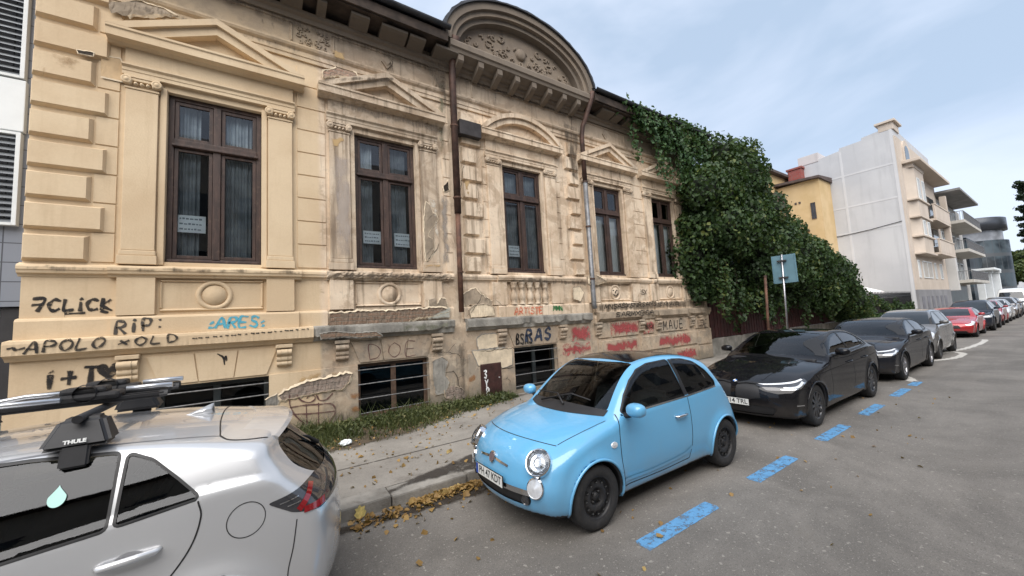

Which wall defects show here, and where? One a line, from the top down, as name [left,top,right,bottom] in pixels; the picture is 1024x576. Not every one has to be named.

spalling [109,0,179,19]
peeling [423,201,438,262]
spalling [463,287,501,307]
spalling [319,297,451,340]
peeling [472,333,513,368]
spalling [265,370,353,406]